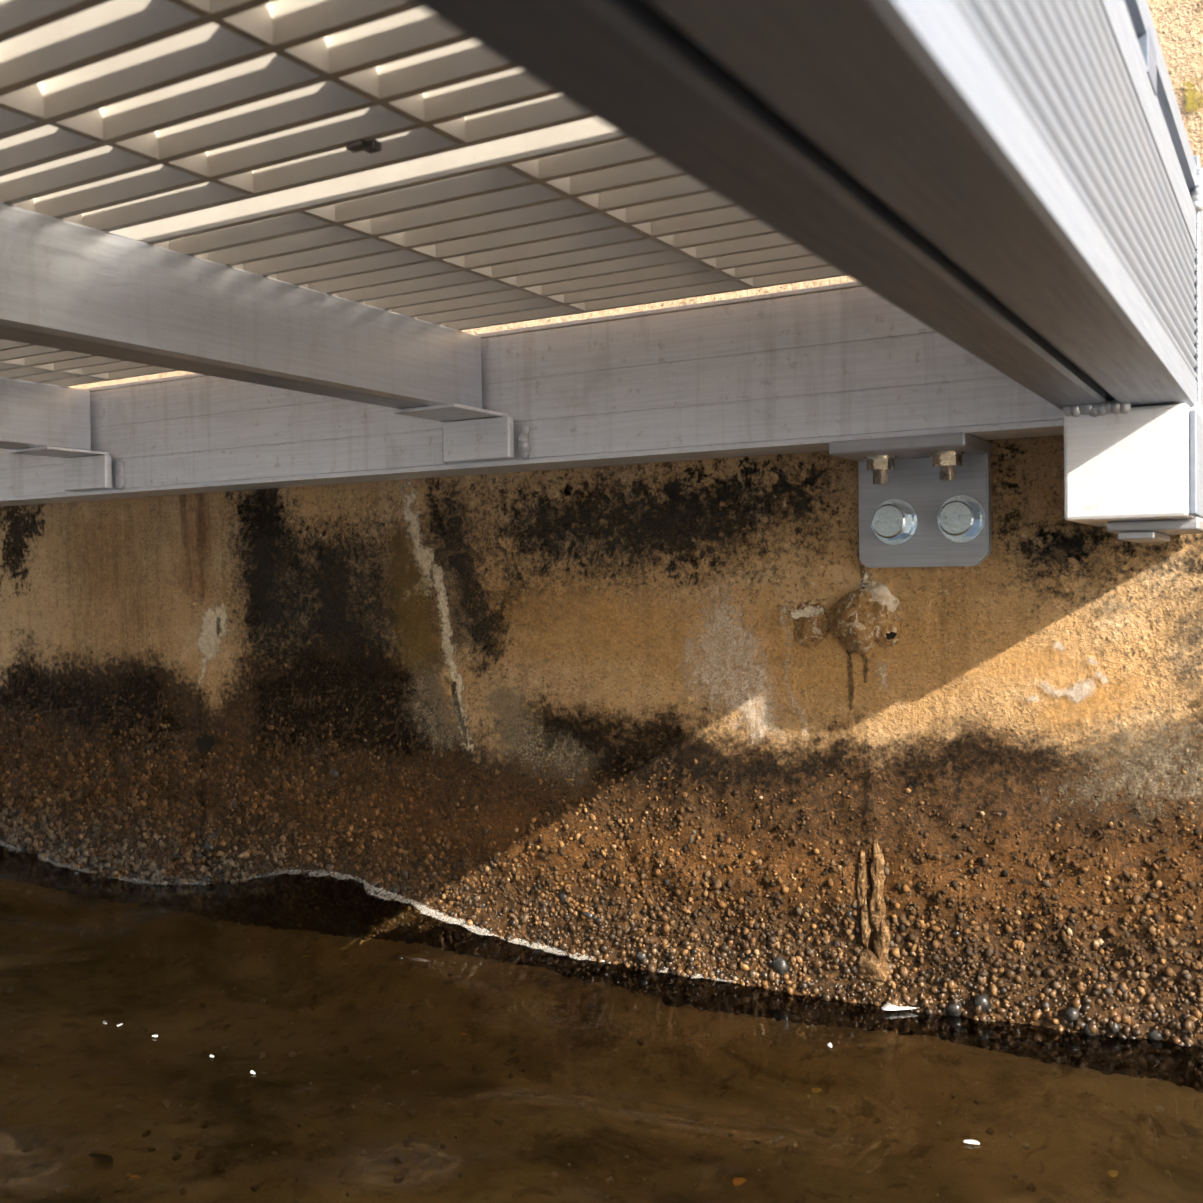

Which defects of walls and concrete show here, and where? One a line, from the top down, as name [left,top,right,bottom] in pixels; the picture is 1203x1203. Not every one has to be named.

peeling [197,603,229,689]
peeling [790,606,824,619]
peeling [859,573,899,612]
peeling [1028,658,1108,703]
damp [0,479,1203,1088]
spalling [0,665,1203,1093]